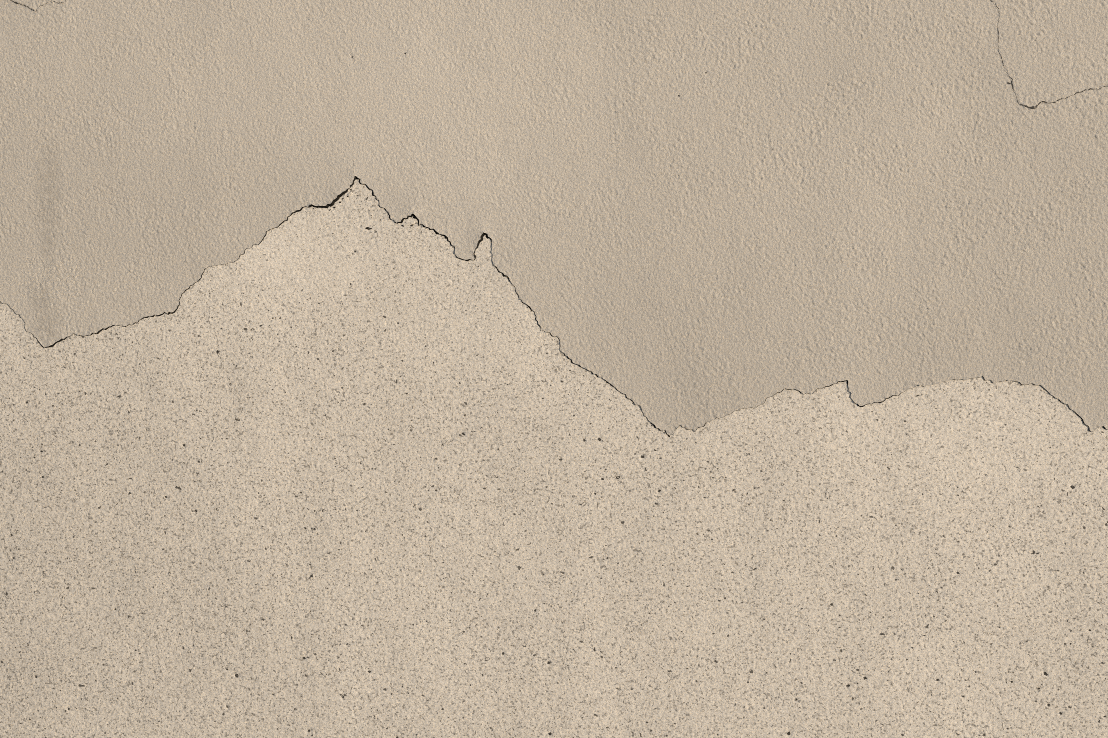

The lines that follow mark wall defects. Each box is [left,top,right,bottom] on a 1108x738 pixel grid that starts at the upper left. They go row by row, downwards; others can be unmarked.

crack [991,0,1108,109]
peeling [0,176,1108,738]